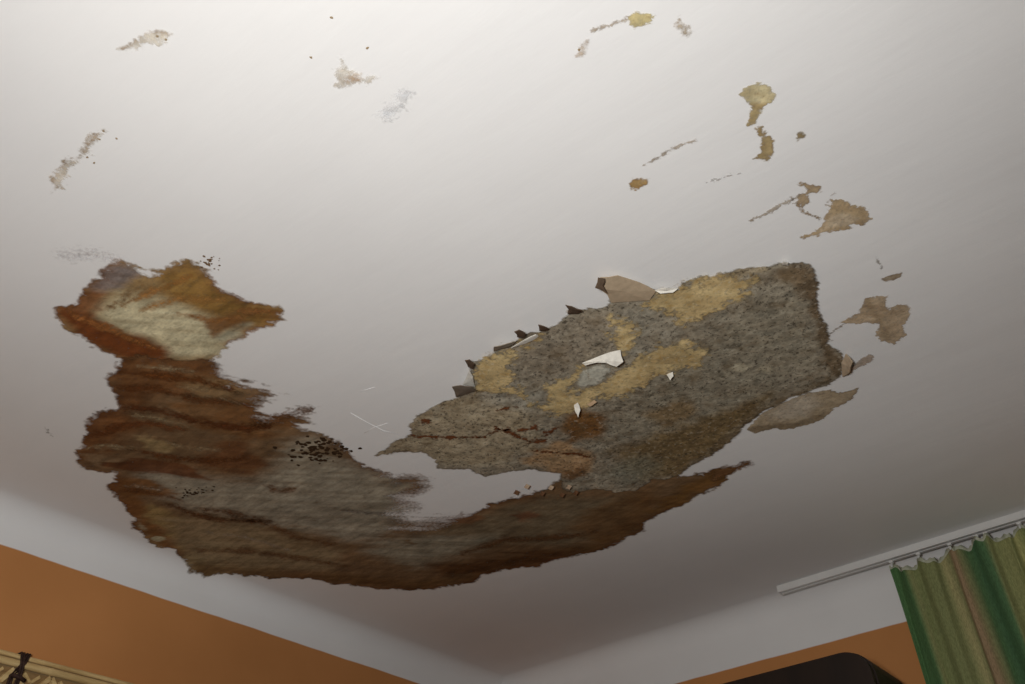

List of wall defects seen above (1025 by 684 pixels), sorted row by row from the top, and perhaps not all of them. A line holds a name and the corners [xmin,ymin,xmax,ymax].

peeling [628,13,654,27]
peeling [121,31,167,50]
peeling [739,82,776,161]
peeling [51,133,97,189]
peeling [629,178,648,191]
peeling [797,182,821,207]
peeling [800,199,873,239]
peeling [842,296,910,344]
peeling [374,262,873,497]